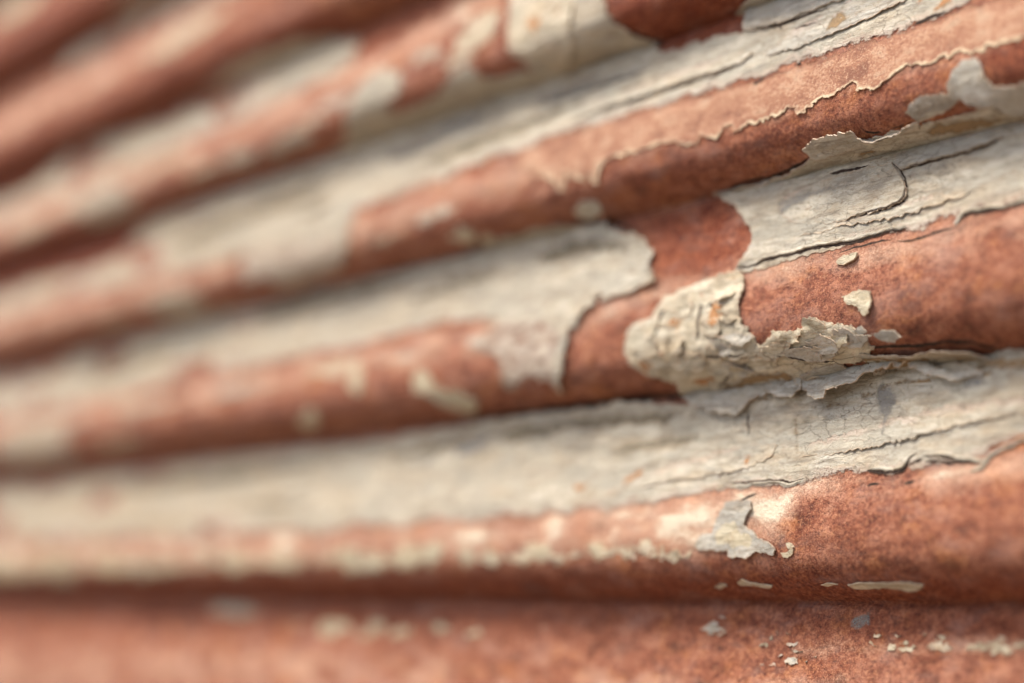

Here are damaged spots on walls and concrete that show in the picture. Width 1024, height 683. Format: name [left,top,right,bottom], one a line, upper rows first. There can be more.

corrosion [928,119,1022,135]
crack [728,104,1024,269]
peeling [0,0,1024,467]
peeling [0,289,1024,585]
crack [867,438,1024,486]
crack [729,478,804,501]
peeling [715,579,773,589]
peeling [821,582,924,592]